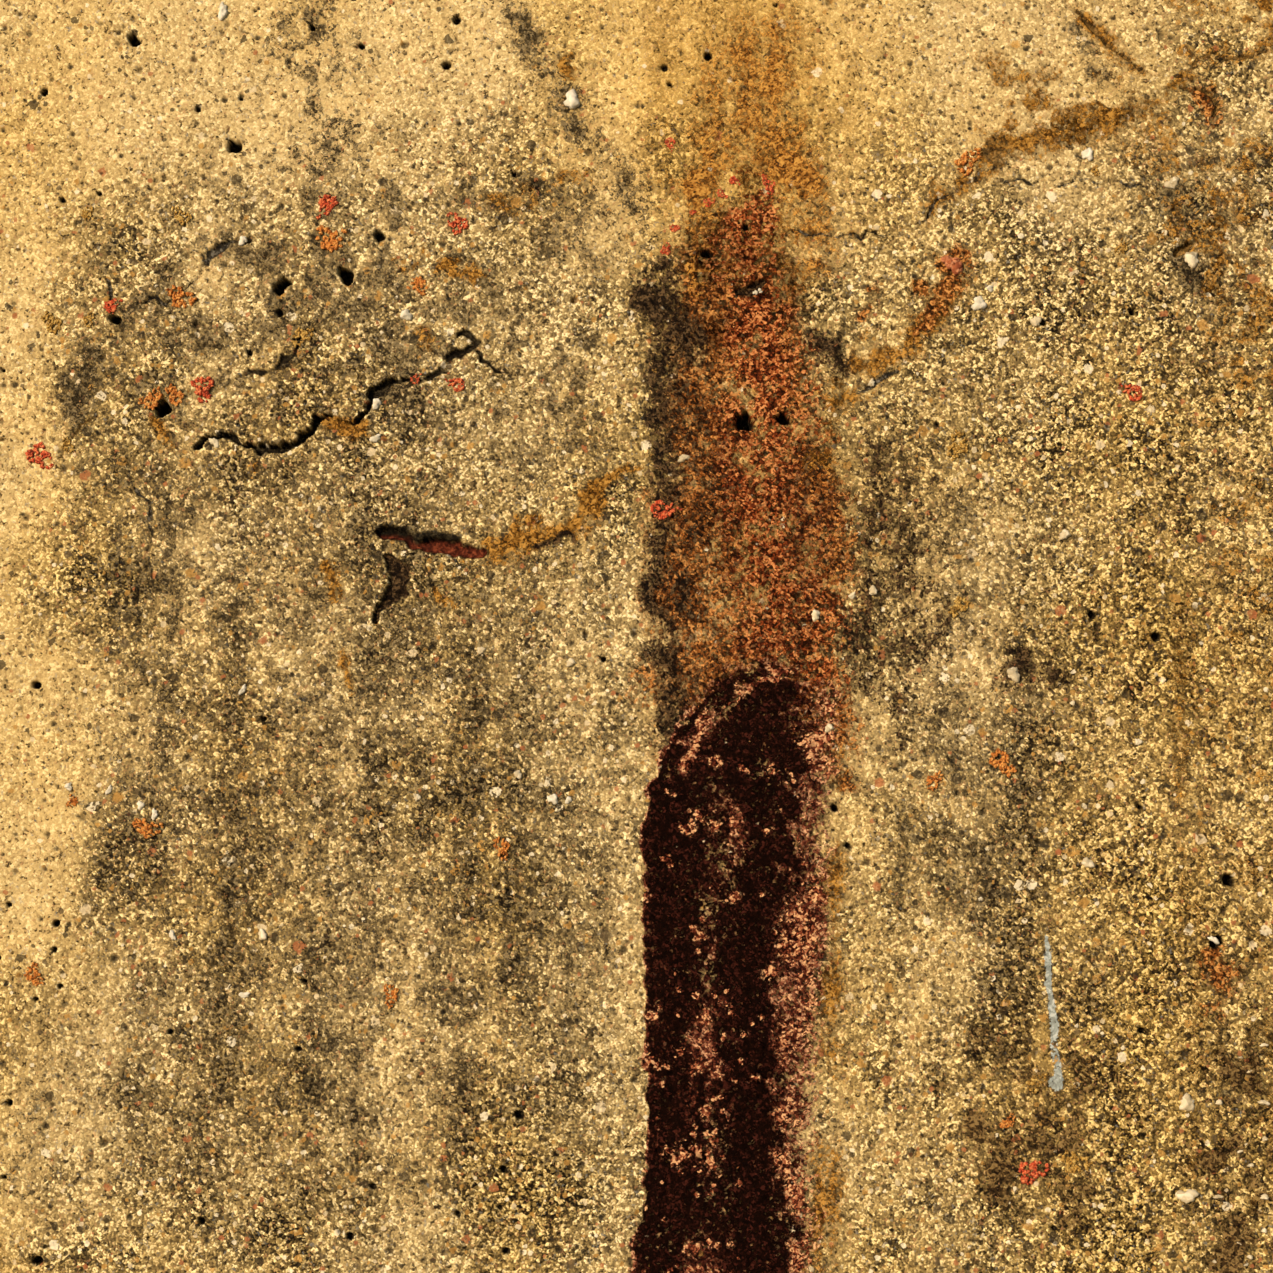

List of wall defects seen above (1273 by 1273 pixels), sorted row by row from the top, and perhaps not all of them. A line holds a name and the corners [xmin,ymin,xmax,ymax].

crack [1075,10,1271,117]
crack [789,166,1143,241]
crack [91,239,250,315]
crack [244,310,321,376]
crack [195,330,523,456]
damp [55,0,666,1245]
rust [461,0,978,1273]
damp [7,1005,93,1201]